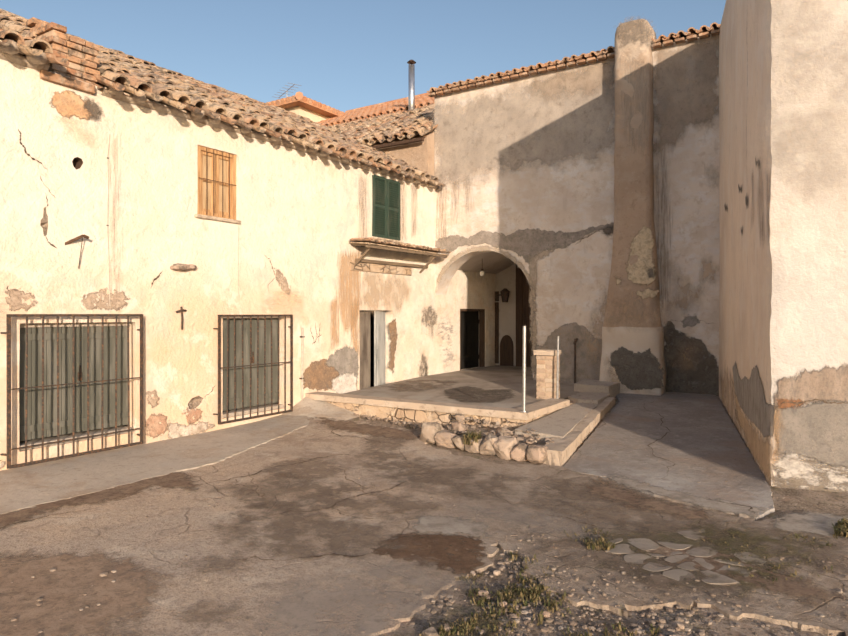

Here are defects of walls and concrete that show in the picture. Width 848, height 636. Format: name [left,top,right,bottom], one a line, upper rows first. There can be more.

peeling [50,90,94,120]
crack [18,129,55,197]
peeling [615,226,659,300]
peeling [5,286,37,311]
peeling [82,289,128,311]
spalling [303,346,359,394]
peeling [145,386,215,439]
peeling [730,361,775,485]
efflorescence [770,451,848,493]